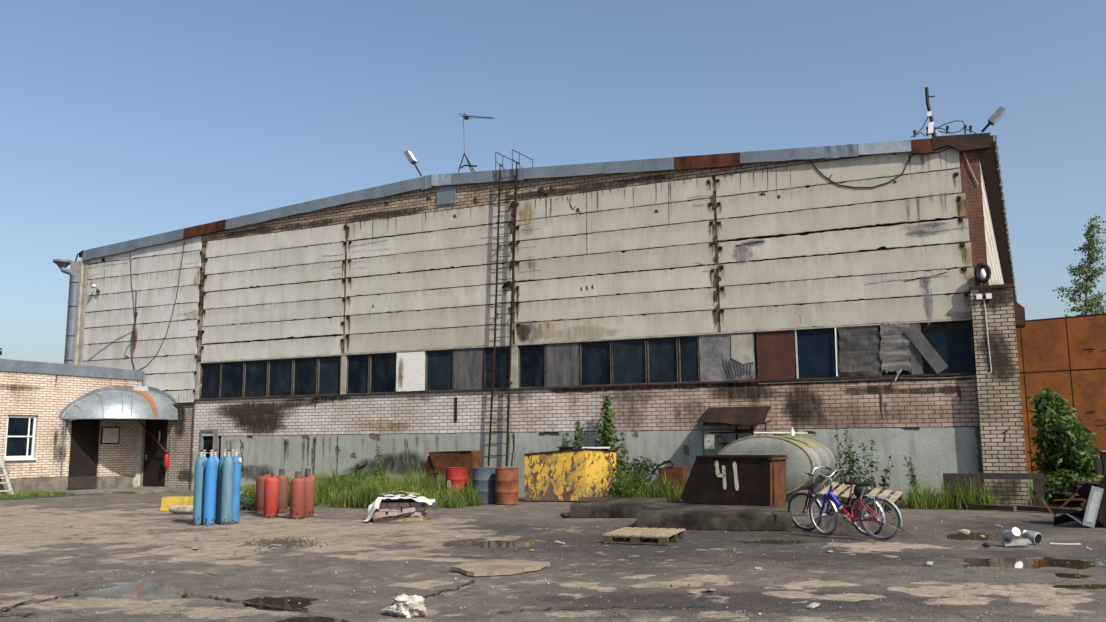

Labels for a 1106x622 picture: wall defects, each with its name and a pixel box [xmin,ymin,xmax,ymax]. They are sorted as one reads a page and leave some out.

peeling [735,240,763,262]
leakage [981,334,1015,381]
corrosion [128,390,156,408]
leakage [551,375,973,419]
leakage [221,396,349,452]